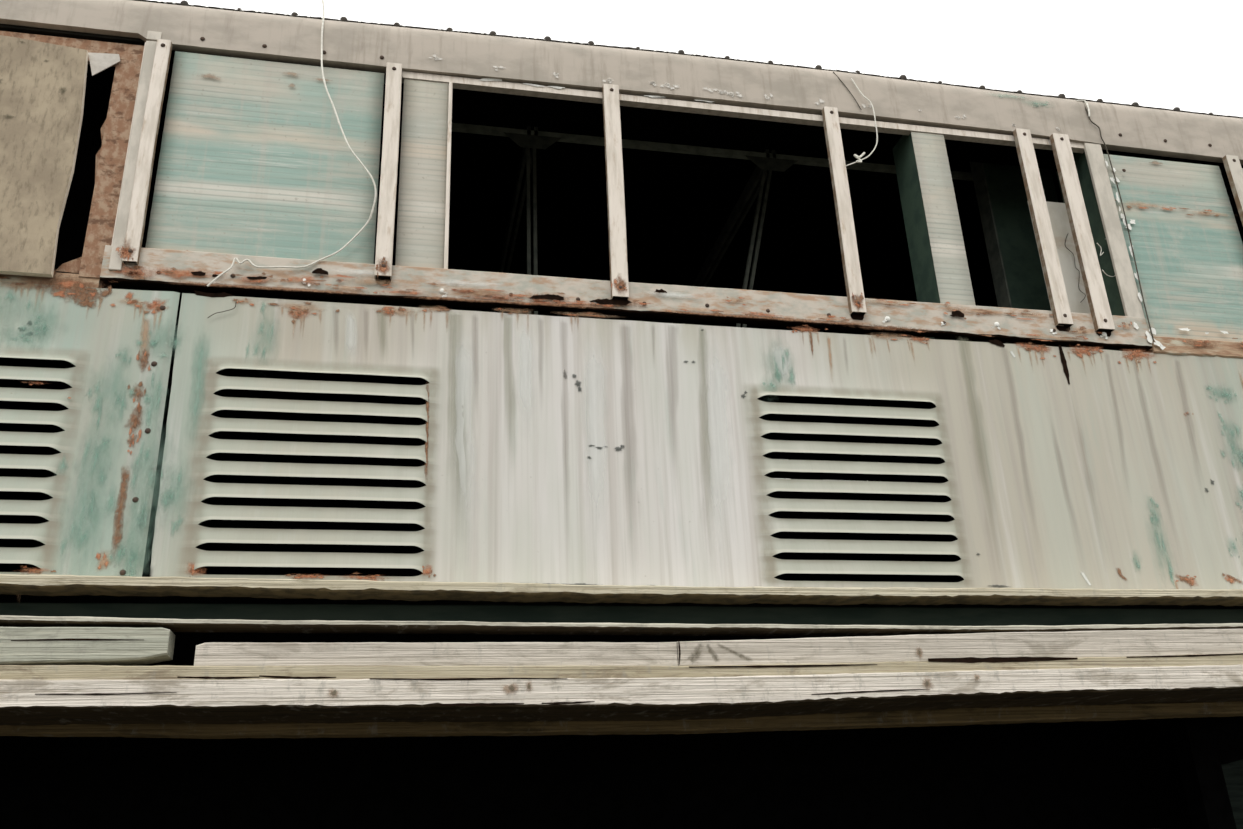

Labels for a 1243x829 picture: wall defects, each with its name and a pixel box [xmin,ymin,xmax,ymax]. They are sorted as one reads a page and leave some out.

rust [0,241,649,454]
rust [666,293,929,354]
rust [944,302,1103,363]
rust [96,468,129,569]